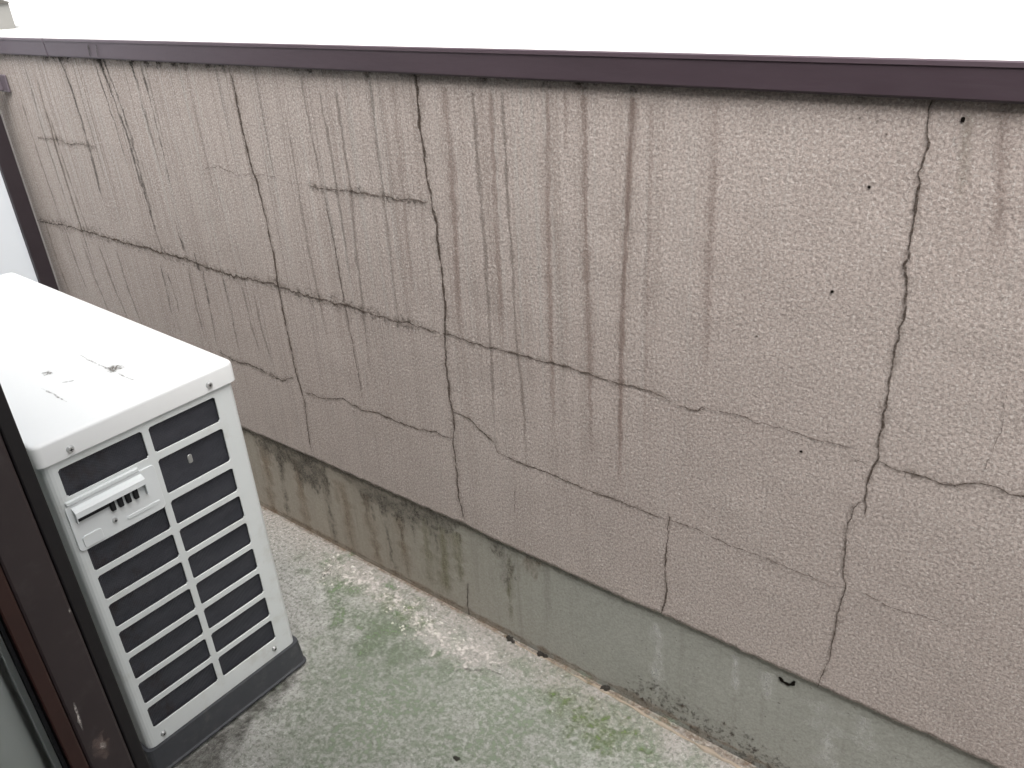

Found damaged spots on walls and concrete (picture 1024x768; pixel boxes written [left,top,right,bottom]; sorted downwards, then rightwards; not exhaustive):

leakage [88,47,153,221]
crack [37,76,1024,685]
leakage [242,428,456,586]
leakage [636,679,778,768]